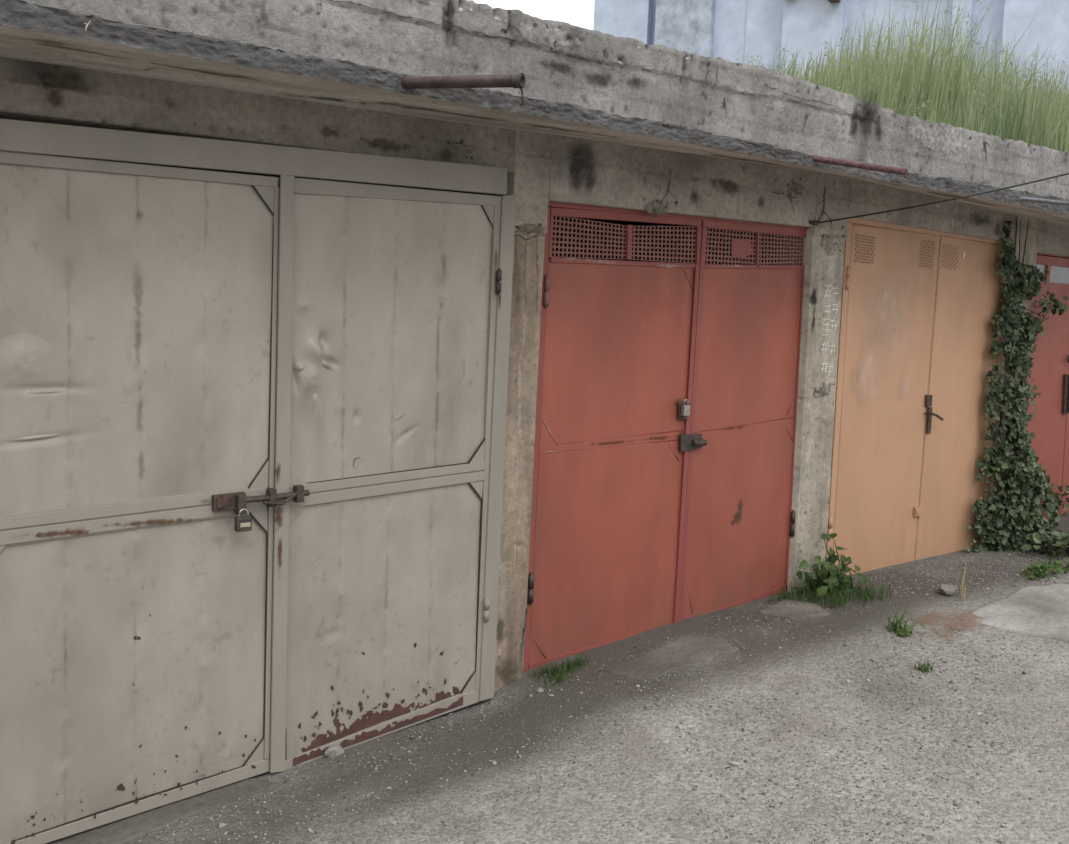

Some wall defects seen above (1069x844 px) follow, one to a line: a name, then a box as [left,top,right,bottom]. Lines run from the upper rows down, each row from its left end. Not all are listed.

damp [852,99,882,137]
peeling [293,679,463,766]